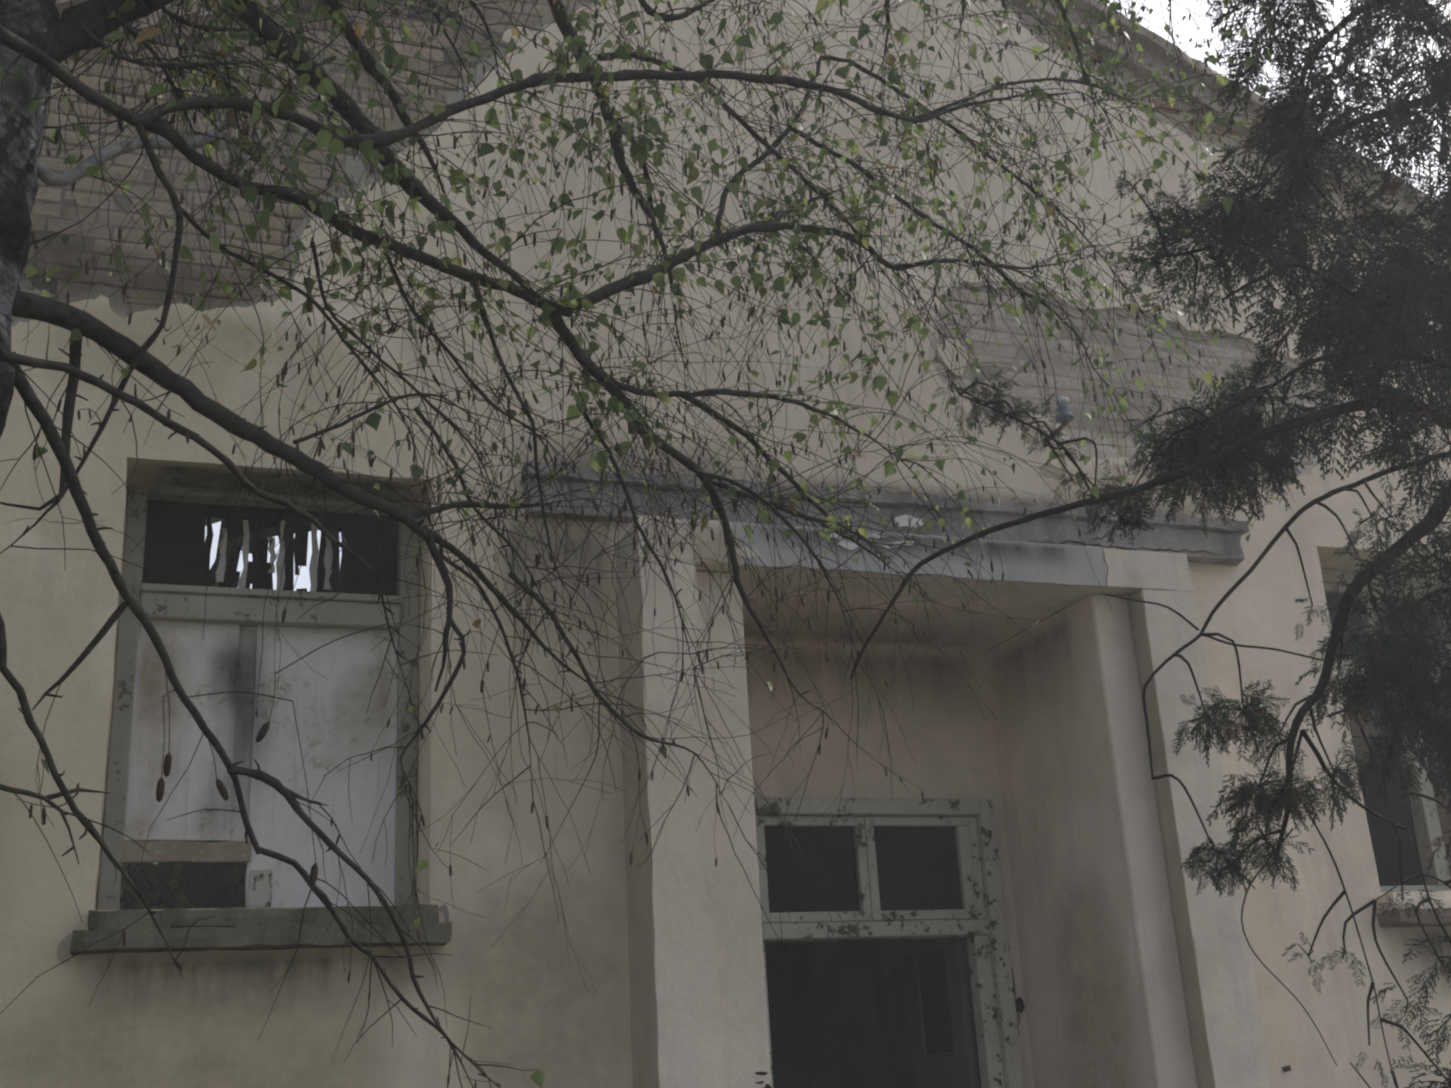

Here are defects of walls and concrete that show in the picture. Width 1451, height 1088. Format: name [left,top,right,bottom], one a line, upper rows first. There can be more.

flaking render [17,0,594,318]
flaking render [928,281,1343,485]
leakage [222,649,253,751]